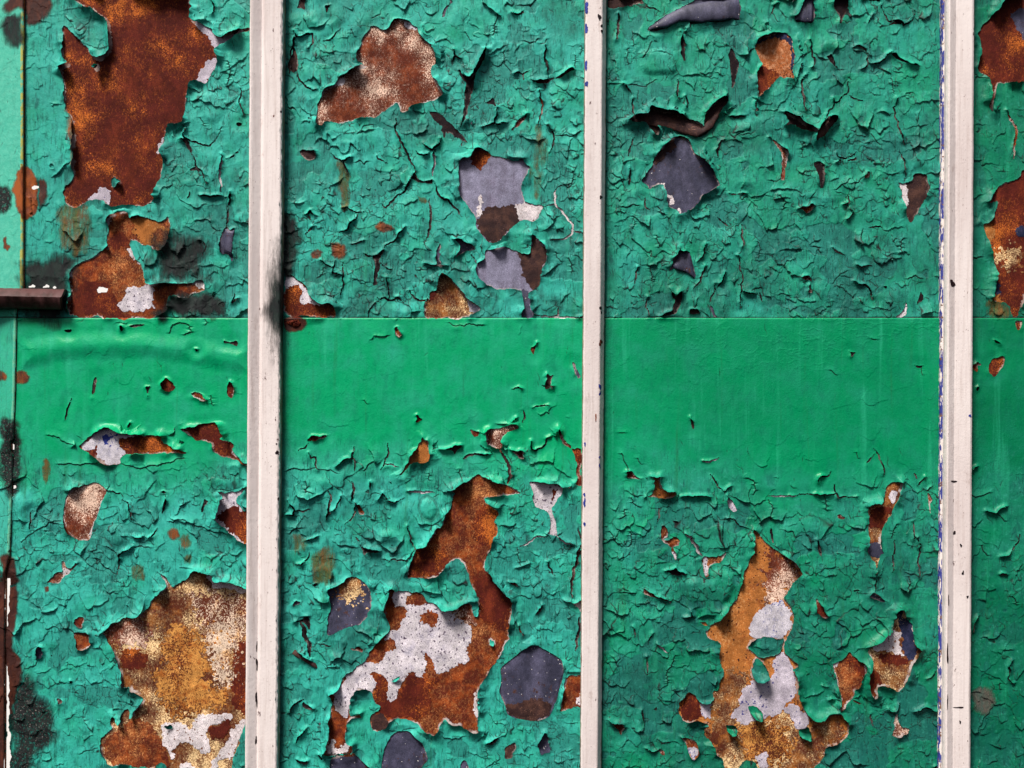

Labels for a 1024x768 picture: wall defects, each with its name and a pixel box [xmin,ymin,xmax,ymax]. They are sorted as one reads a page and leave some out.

rust [12,0,250,324]
crack [316,6,583,322]
peeling [425,108,550,323]
crack [797,2,919,181]
crack [94,457,227,579]
peeling [75,418,247,470]
rust [96,529,246,768]
peeling [197,484,247,548]
rust [321,470,525,759]
peeling [495,641,568,759]
crack [609,444,937,564]
rust [674,526,923,768]